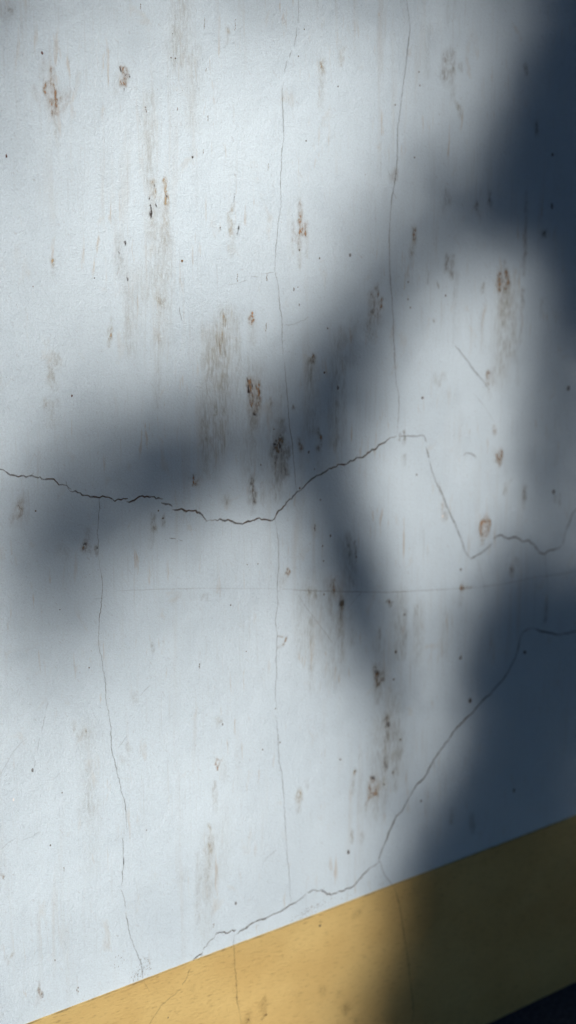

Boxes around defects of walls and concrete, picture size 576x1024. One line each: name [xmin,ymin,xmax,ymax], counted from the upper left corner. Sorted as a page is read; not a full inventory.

crack [0,437,393,524]
crack [415,629,576,787]
crack [218,900,299,934]